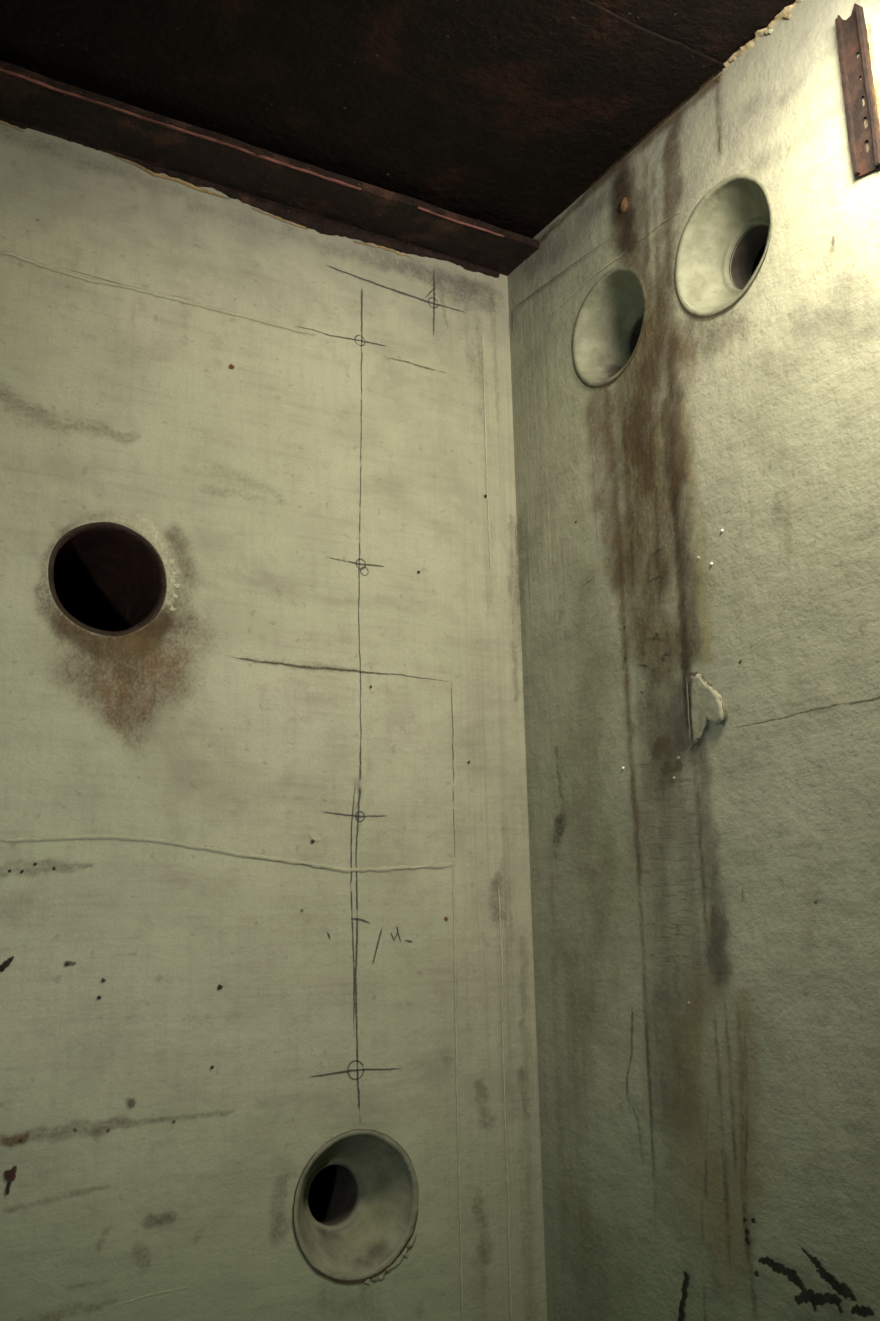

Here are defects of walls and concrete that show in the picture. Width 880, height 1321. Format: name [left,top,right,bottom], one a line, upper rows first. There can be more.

rust [56,607,187,730]
crack [735,696,880,728]